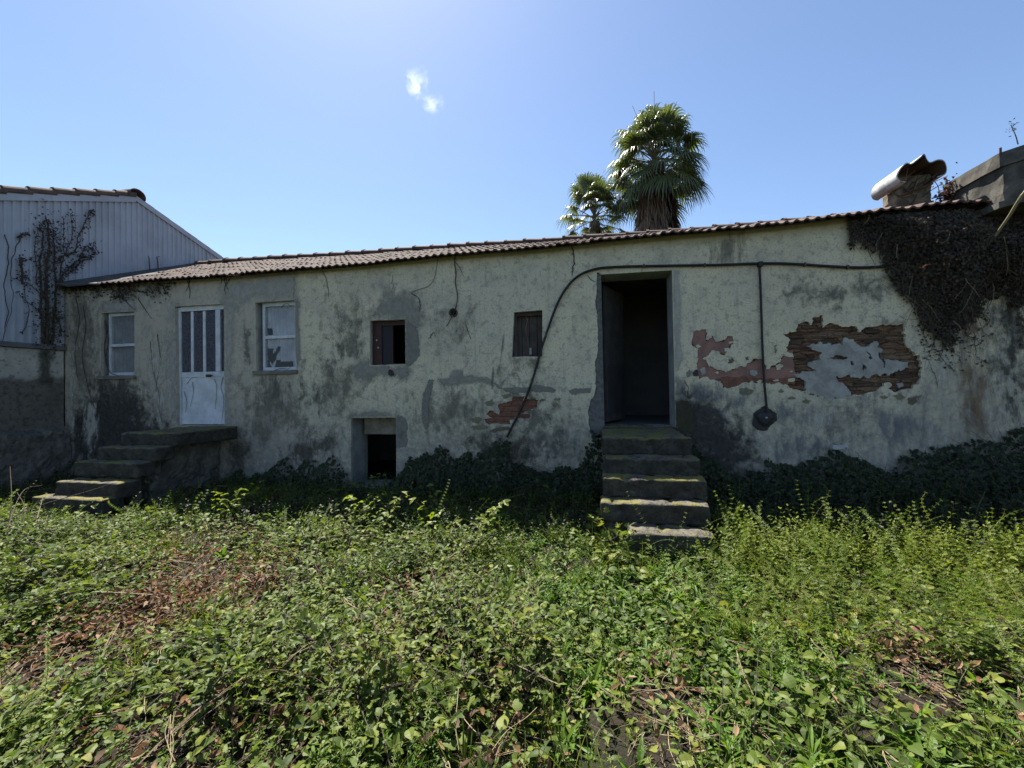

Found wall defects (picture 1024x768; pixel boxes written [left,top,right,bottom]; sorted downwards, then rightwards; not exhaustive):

flaking render [686,316,922,405]
flaking render [471,393,560,433]
leakage [675,385,760,482]